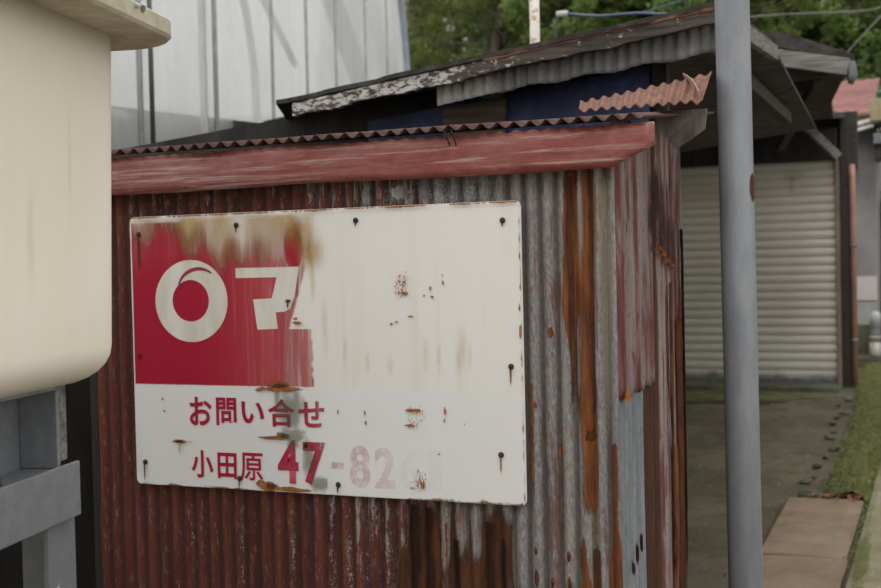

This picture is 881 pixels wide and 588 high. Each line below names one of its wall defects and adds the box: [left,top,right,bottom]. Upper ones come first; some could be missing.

rust [130,209,332,244]
rust [211,480,310,493]
rust [255,381,302,392]
rust [400,357,537,588]
rust [562,169,598,512]
rust [567,444,643,588]
rust [669,229,688,588]